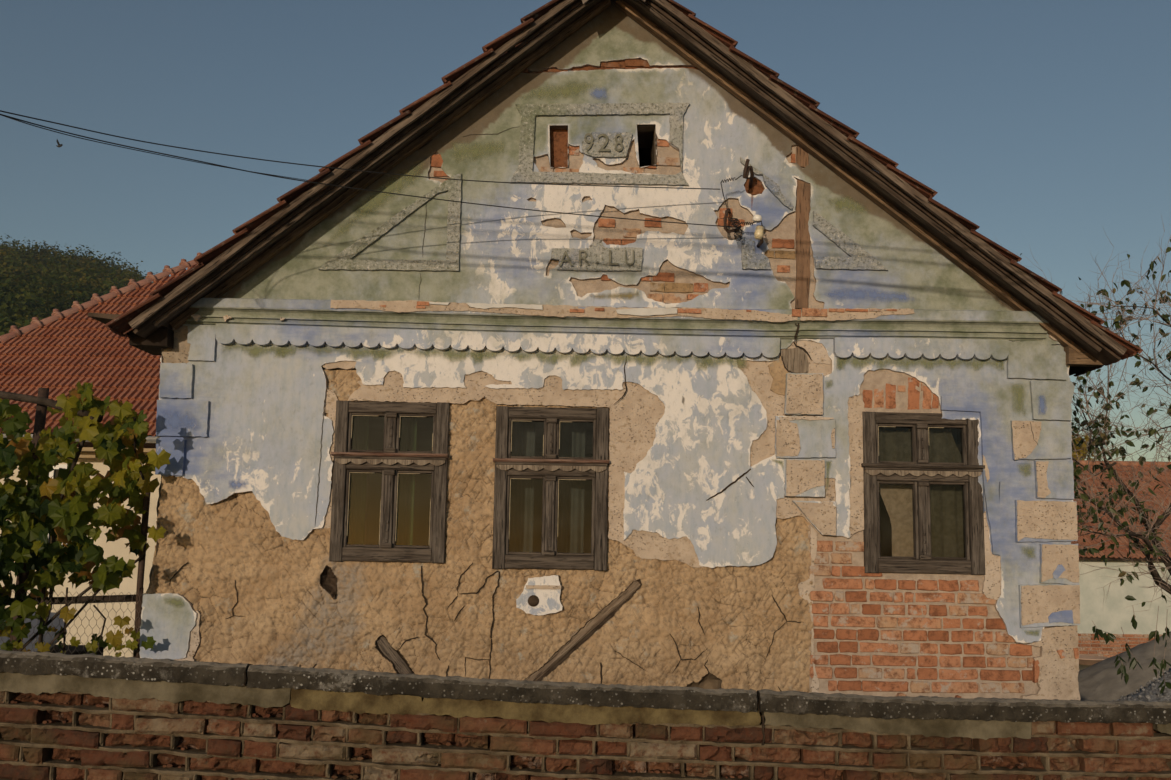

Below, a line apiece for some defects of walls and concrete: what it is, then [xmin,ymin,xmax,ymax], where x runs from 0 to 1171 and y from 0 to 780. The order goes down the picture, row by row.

flaking render [428,152,449,183]
flaking render [533,136,681,175]
flaking render [330,178,914,323]
peeling [162,326,191,364]
crack [706,468,754,501]
flaking render [146,340,1081,700]
crack [399,563,500,679]
crack [600,607,710,684]
crack [764,595,801,662]
peeling [0,672,1032,740]